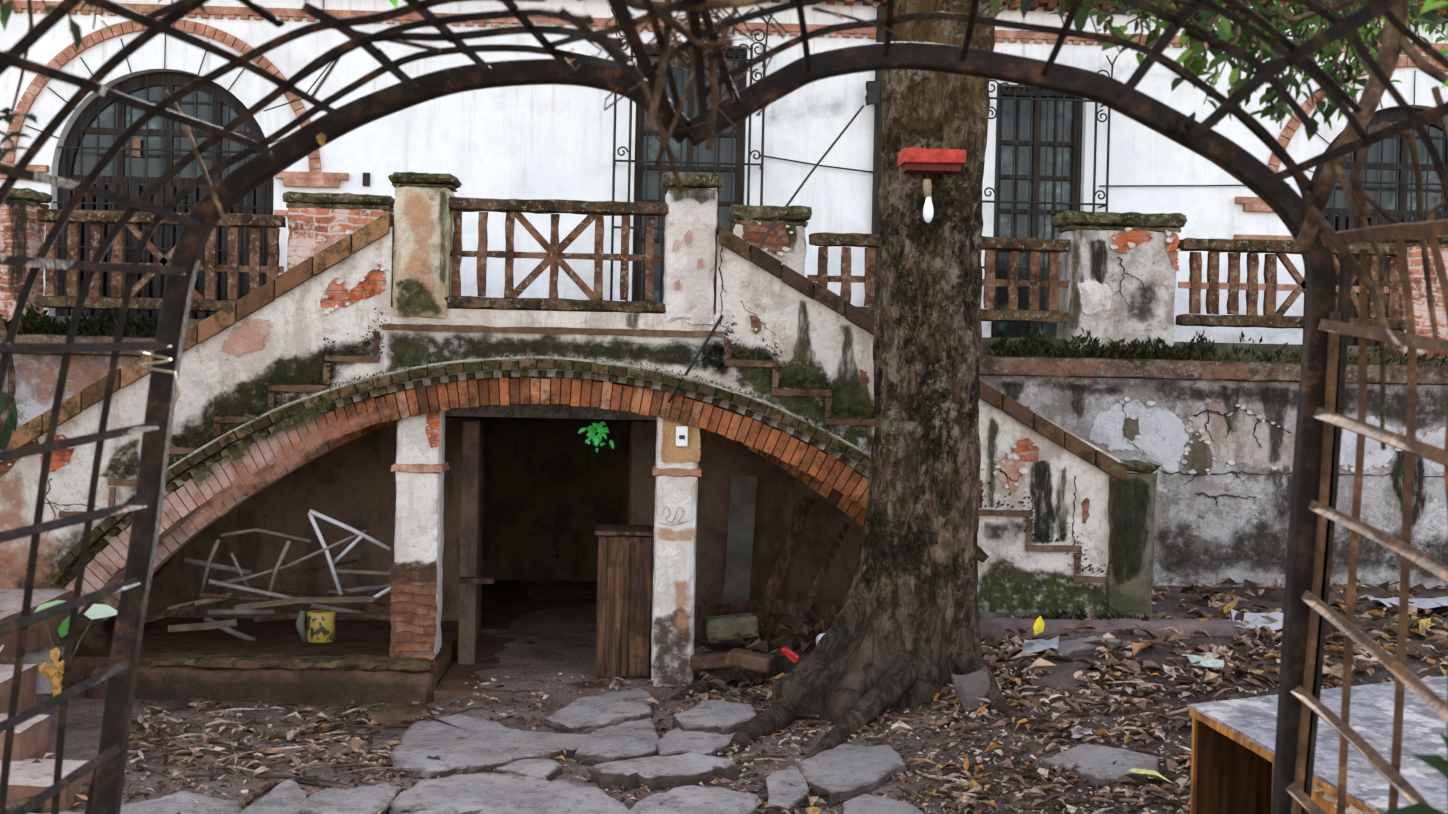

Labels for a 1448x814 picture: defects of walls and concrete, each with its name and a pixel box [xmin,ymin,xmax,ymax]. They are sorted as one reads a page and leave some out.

flaking render [1110,227,1181,271]
flaking render [320,261,388,314]
leakage [387,190,729,374]
crack [1109,257,1147,307]
leakage [1003,382,1023,401]
leakage [1045,380,1123,416]
leakage [1343,387,1448,430]
peeling [1089,397,1295,477]
peeling [993,438,1039,493]
leakage [1030,460,1055,544]
leakage [1111,381,1299,585]
leakage [1331,447,1448,579]